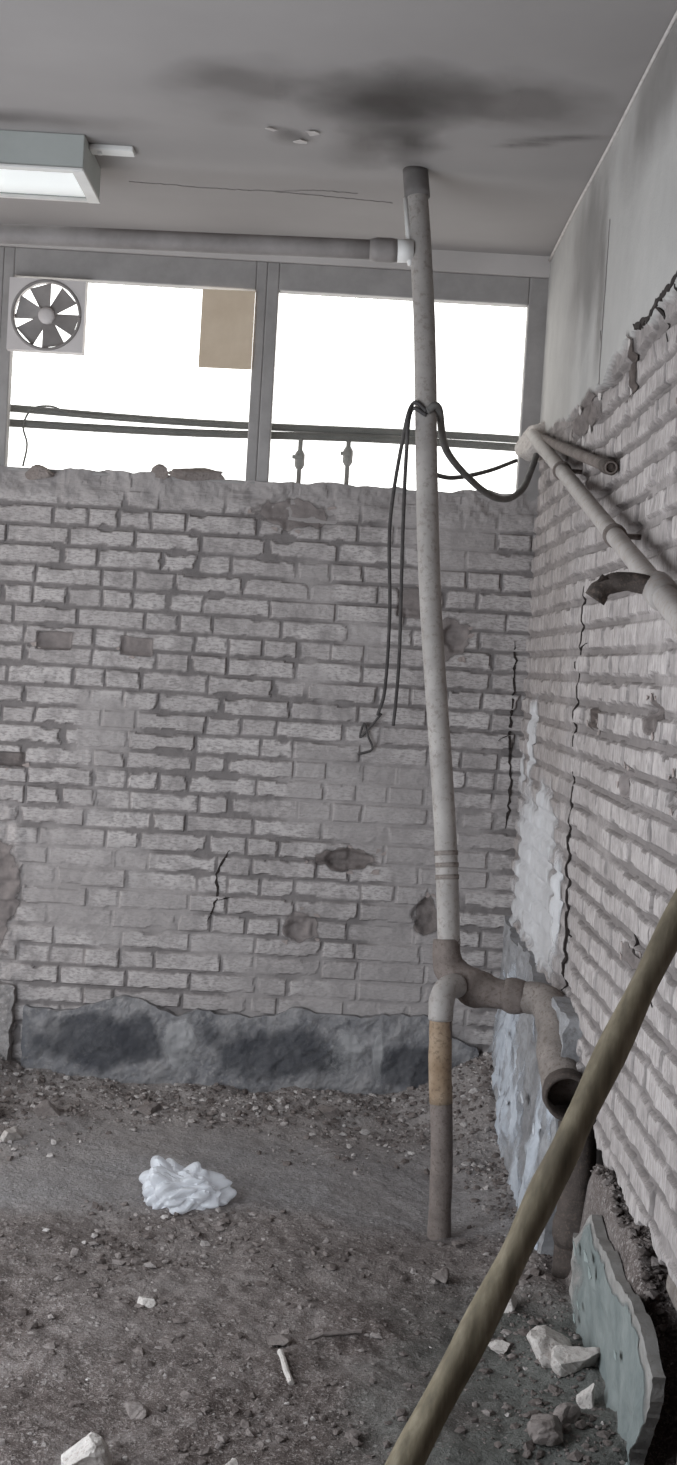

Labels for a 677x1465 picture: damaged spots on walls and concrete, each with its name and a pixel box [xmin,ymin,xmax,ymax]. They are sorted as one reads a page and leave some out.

spalling [626,334,638,398]
spalling [571,390,602,446]
spalling [587,708,601,735]
spalling [642,693,665,741]
crack [560,587,588,991]
spalling [616,761,635,800]
spalling [0,841,21,953]
crack [207,850,233,921]
spalling [305,845,386,875]